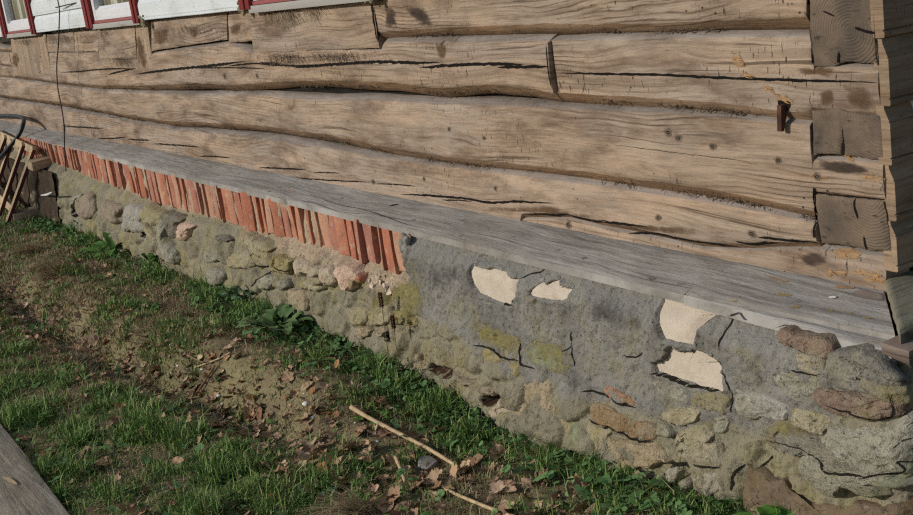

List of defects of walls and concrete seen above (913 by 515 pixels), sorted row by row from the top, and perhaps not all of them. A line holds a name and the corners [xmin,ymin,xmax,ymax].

crack [854,26,874,34]
crack [64,53,877,83]
crack [66,125,229,158]
crack [260,167,817,248]
spalling [471,258,519,305]
spalling [531,276,574,300]
crack [472,343,534,369]
spalling [650,299,741,391]
crack [718,318,733,350]
crack [623,352,733,413]
crack [670,441,913,491]